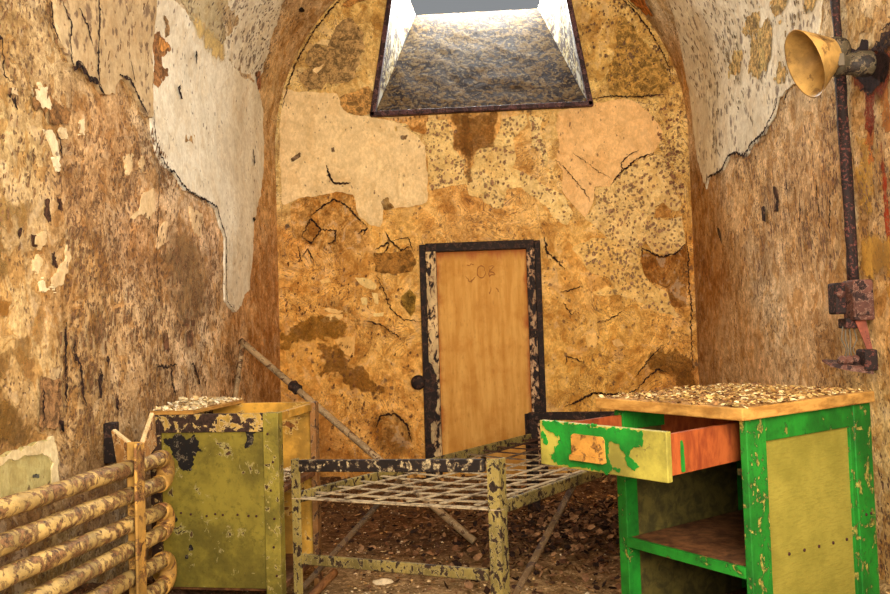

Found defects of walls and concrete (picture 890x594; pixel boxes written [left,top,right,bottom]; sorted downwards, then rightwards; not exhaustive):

peeling [0,0,285,498]
peeling [279,0,464,445]
damp [451,111,498,182]
peeling [467,0,839,311]
rust [856,83,890,300]
crack [869,22,890,58]